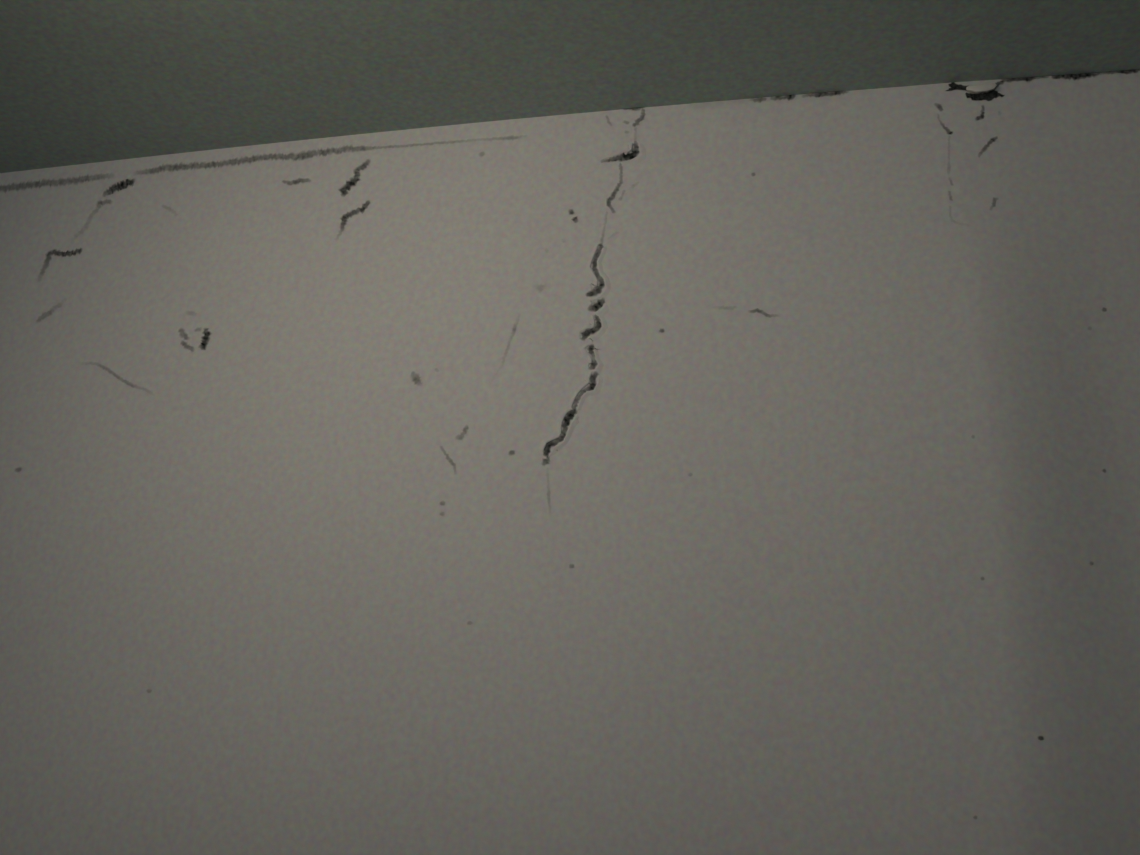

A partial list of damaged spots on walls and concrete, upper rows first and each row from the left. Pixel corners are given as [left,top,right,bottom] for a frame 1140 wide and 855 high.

crack [776,91,840,99]
flaking render [946,81,1004,101]
crack [101,172,134,201]
crack [340,164,369,224]
crack [601,142,646,204]
crack [47,248,81,256]
crack [538,244,611,463]